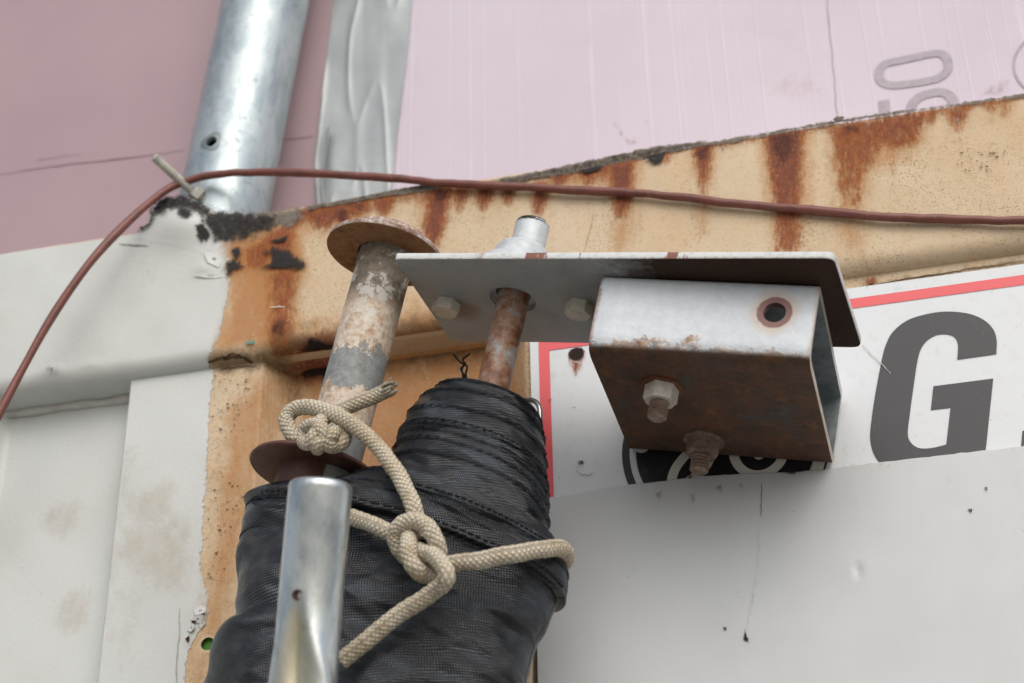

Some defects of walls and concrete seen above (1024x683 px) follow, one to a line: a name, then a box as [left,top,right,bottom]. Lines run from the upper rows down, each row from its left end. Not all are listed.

rust [532,160,635,229]
rust [692,99,1011,252]
peeling [193,247,244,278]
peeling [260,235,307,270]
rust [223,181,515,400]
rust [371,343,487,450]
rust [362,447,381,467]